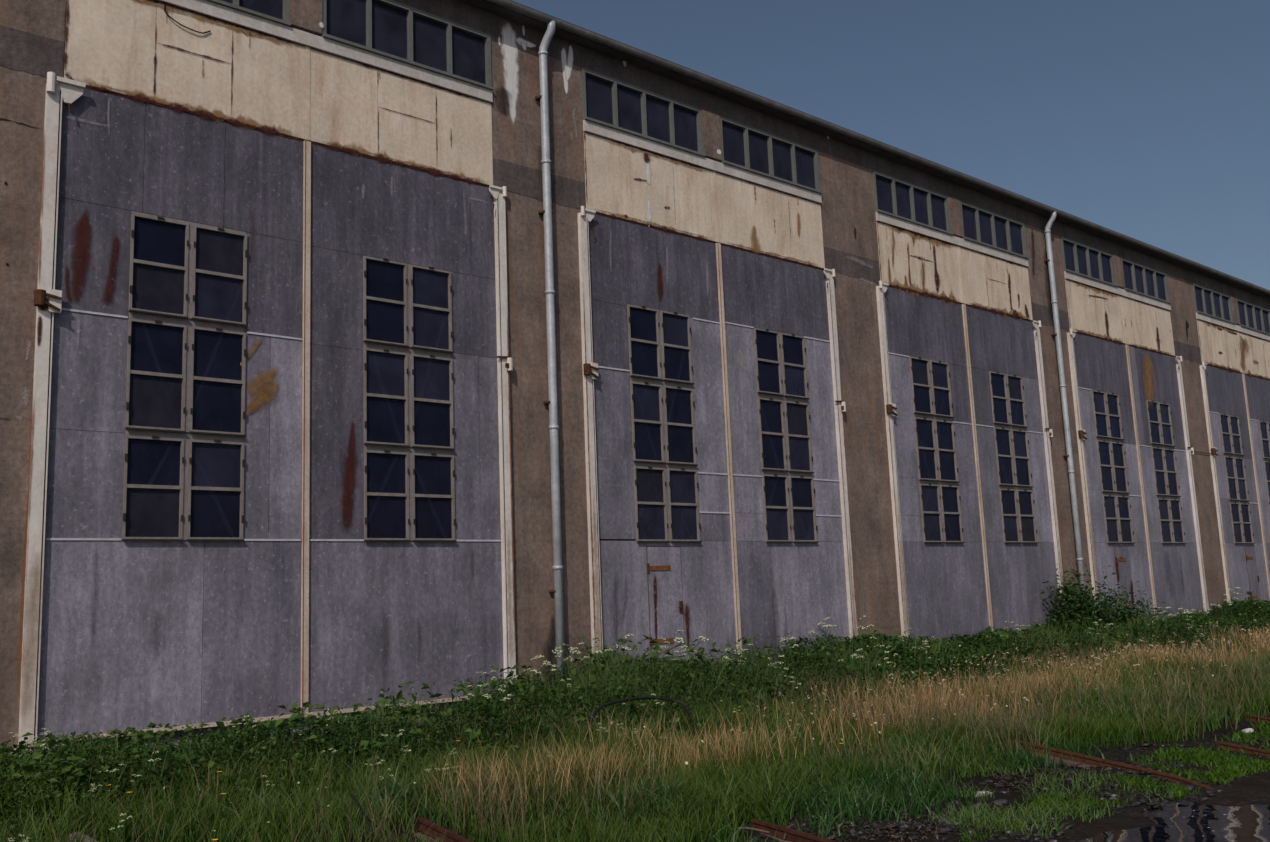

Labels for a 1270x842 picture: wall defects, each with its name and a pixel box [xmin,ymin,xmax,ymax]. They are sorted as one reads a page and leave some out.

rust [63,0,73,80]
rust [87,0,293,136]
rust [324,60,483,184]
peeling [496,88,509,114]
rust [103,235,118,302]
rust [877,221,1029,320]
rust [246,369,278,415]
rust [342,422,357,528]